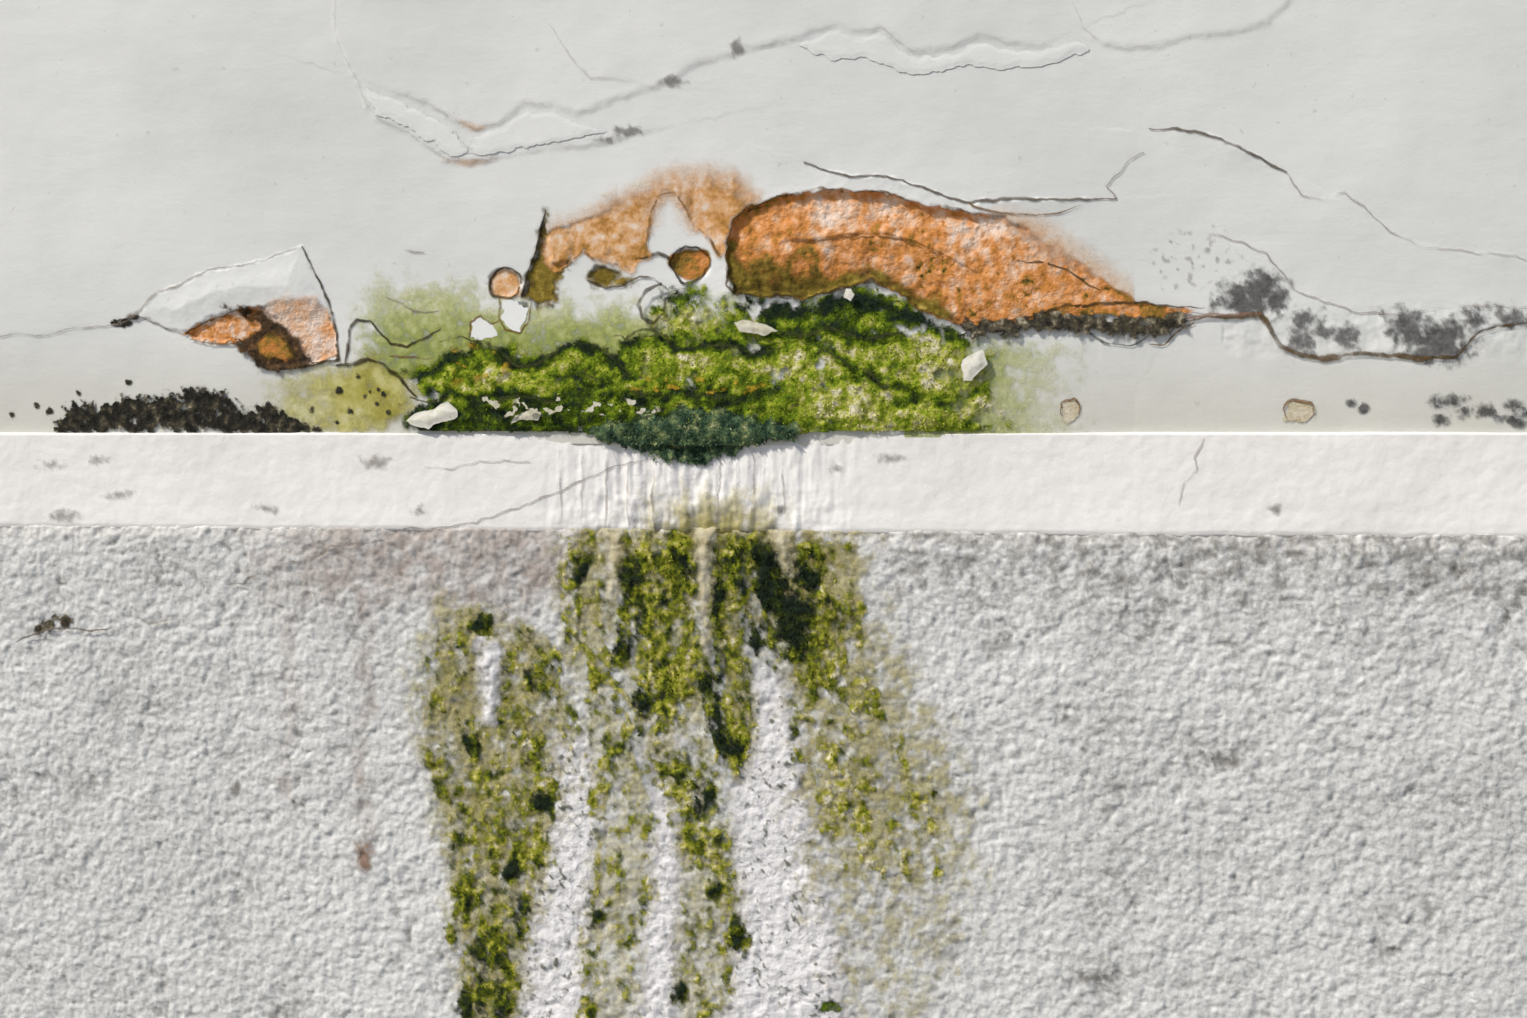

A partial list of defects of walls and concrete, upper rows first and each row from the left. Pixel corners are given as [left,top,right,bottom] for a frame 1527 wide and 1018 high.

peeling [798,30,1089,75]
peeling [365,87,641,156]
crack [804,127,1306,216]
crack [1343,192,1399,236]
flaking render [110,246,340,374]
damp [1210,268,1360,355]
crack [1217,234,1425,314]
crack [1170,304,1527,362]
damp [33,379,321,433]
damp [514,729,606,1018]
damp [633,718,687,1018]
damp [723,672,847,1018]